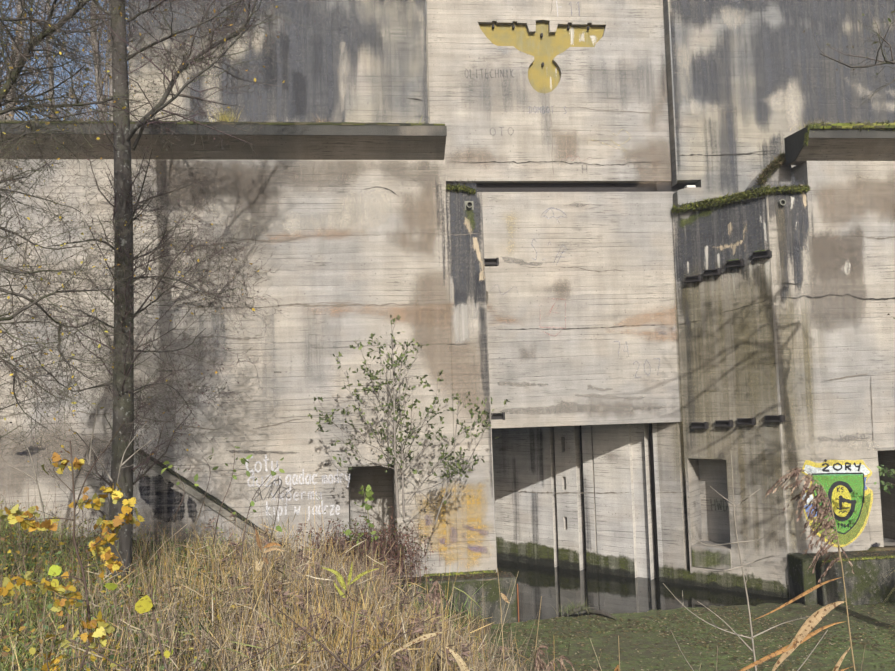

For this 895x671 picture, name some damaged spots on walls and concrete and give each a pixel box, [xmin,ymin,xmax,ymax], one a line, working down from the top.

water stain [129,0,380,122]
water stain [670,0,895,166]
water stain [674,30,862,338]
crack [504,320,699,330]
crack [720,283,895,314]